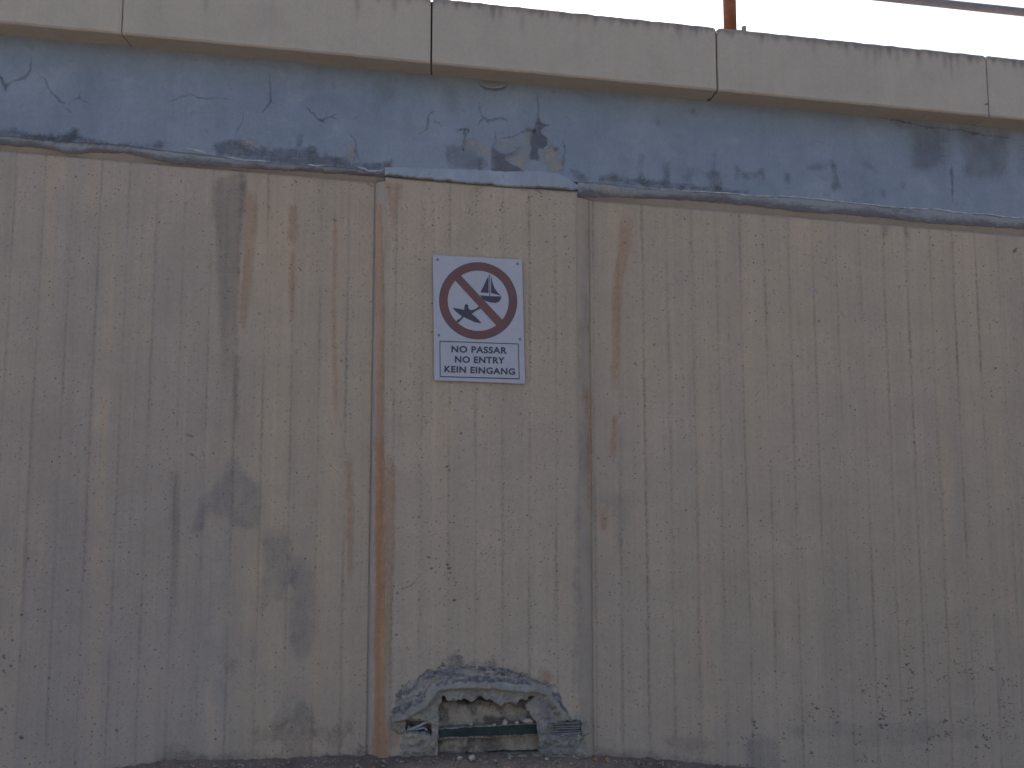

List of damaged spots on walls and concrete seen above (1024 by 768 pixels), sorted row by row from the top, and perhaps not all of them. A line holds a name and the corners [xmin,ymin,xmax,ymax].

peeling [490,117,558,173]
spalling [389,662,590,759]